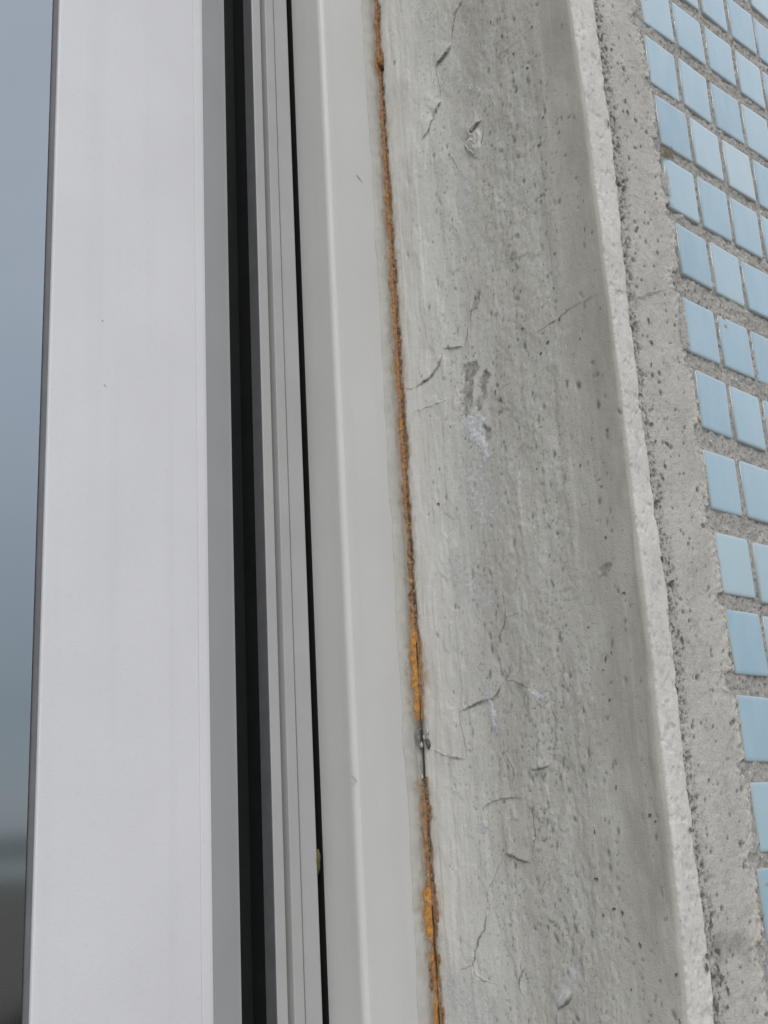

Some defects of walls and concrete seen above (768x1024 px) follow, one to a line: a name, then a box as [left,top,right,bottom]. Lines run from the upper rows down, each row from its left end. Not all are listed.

rust [374,0,426,729]
rust [418,776,445,1024]